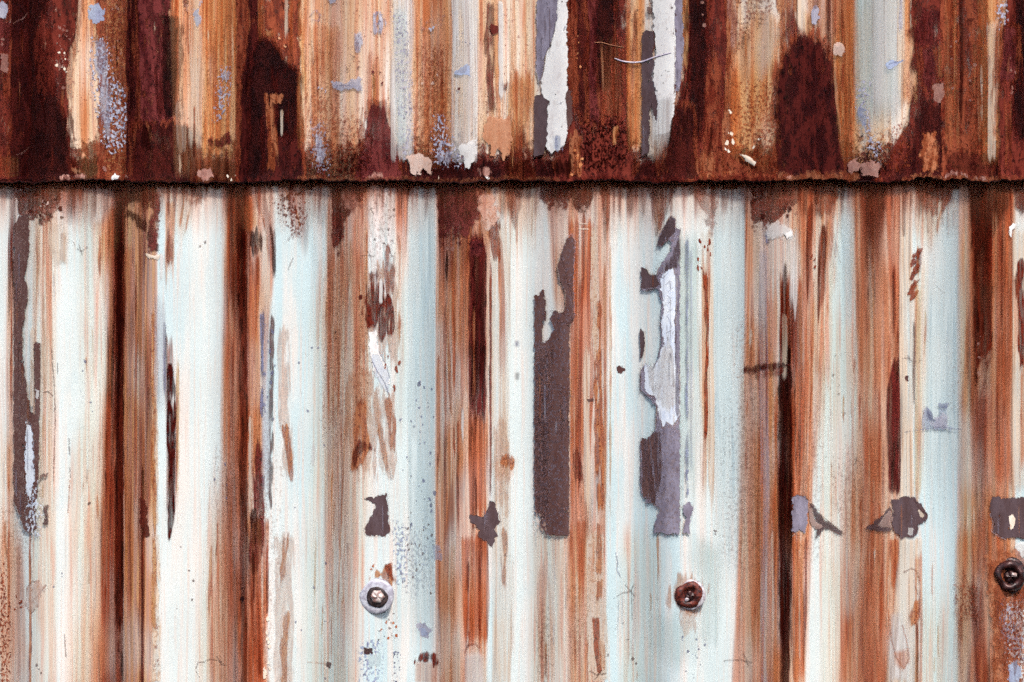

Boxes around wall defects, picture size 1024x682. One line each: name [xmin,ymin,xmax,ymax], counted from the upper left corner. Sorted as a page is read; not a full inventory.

peeling [534,0,573,156]
peeling [641,0,684,156]
rust [0,0,1024,539]
peeling [13,214,49,537]
rust [249,435,264,571]
peeling [365,493,408,586]
peeling [534,235,575,536]
peeling [640,216,694,535]
rust [778,260,798,663]
peeling [866,496,928,539]
rust [887,539,921,682]
rust [985,541,1024,682]